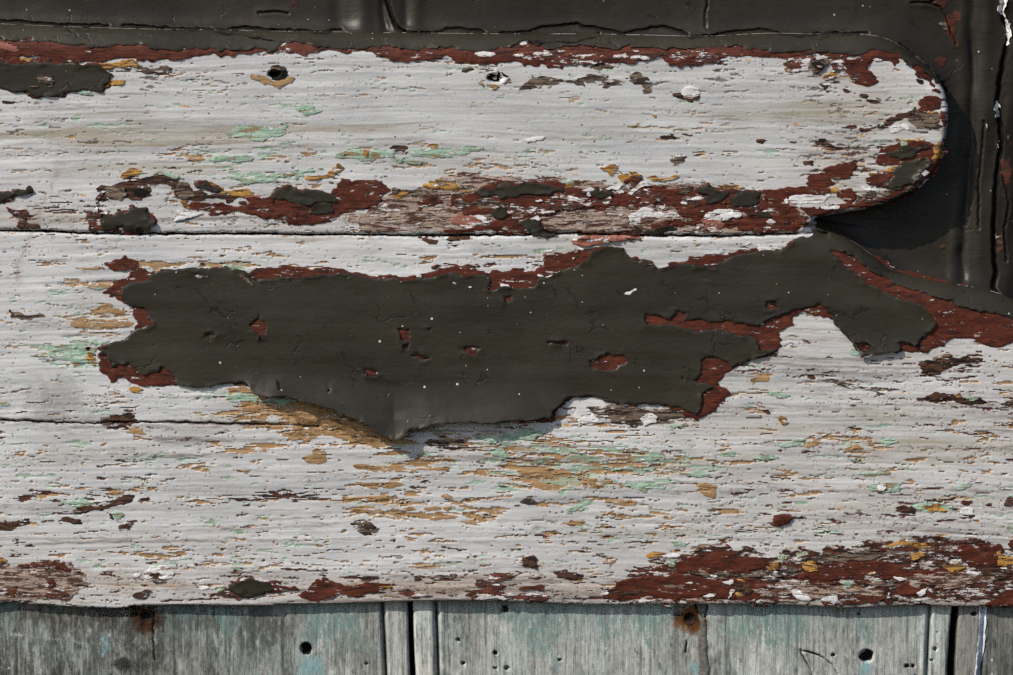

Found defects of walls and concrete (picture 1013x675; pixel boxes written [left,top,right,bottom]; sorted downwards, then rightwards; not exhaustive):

crack [386,0,863,44]
crack [900,45,947,91]
peeling [0,24,1013,536]
crack [0,419,315,427]
peeling [0,557,89,603]
peeling [132,564,174,598]
peeling [198,568,457,602]
peeling [466,571,550,604]
peeling [553,569,584,581]
peeling [601,525,1013,609]
rust [671,605,707,633]